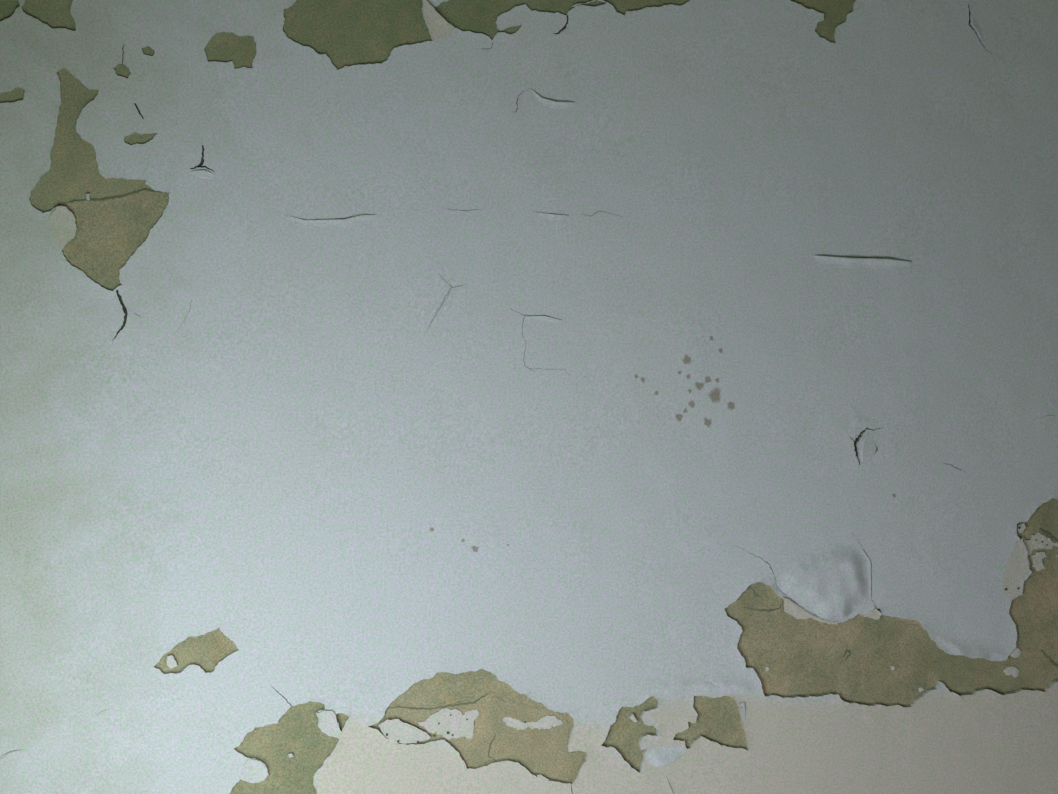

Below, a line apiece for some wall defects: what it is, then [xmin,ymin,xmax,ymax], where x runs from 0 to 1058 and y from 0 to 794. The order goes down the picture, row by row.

peeling [283,0,690,70]
crack [516,89,576,111]
peeling [29,68,169,291]
crack [814,254,912,269]
crack [112,290,141,341]
crack [854,428,879,462]
peeling [725,498,1058,706]
peeling [155,627,238,673]
peeling [230,688,342,794]
peeling [371,669,586,791]
peeling [602,696,658,771]
peeling [673,696,747,749]